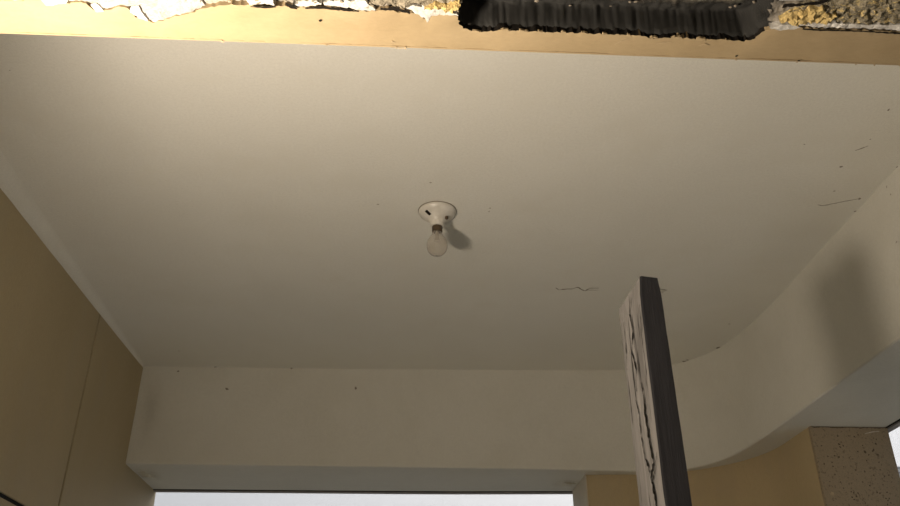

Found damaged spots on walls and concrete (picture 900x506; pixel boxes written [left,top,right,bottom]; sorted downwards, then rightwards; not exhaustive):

peeling [130,5,148,21]
peeling [204,0,462,22]
spalling [767,0,900,31]
crack [623,306,657,506]